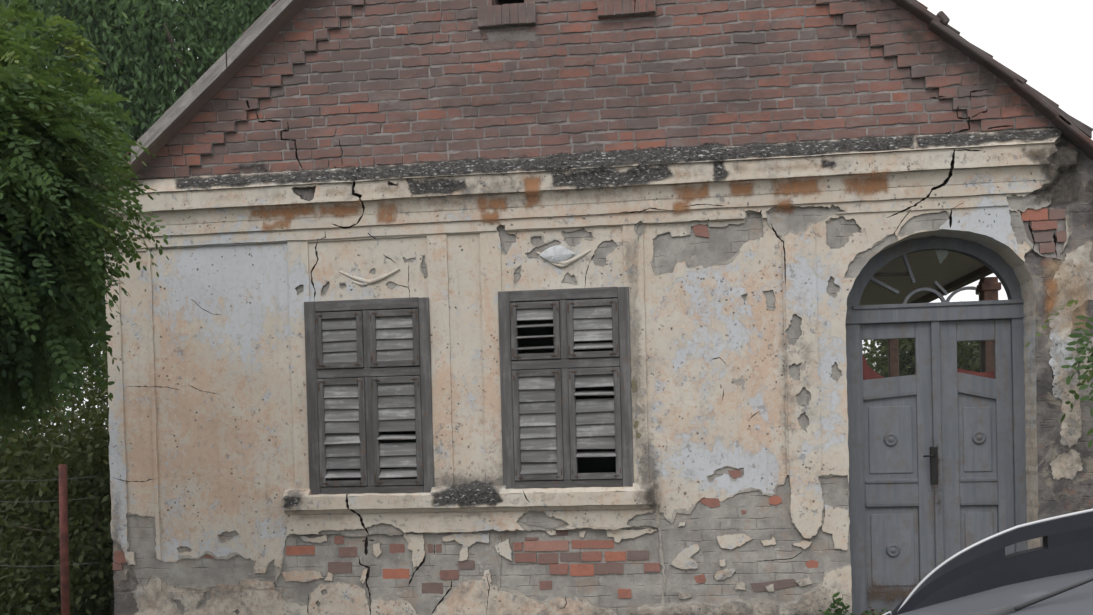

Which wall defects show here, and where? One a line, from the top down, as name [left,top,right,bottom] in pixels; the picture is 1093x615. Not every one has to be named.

crack [246,100,302,168]
crack [887,89,1015,232]
crack [311,141,410,297]
spalling [634,204,861,275]
spalling [826,210,950,298]
spalling [785,314,802,345]
spalling [788,363,811,432]
spalling [830,362,842,383]
spalling [1006,136,1093,523]
crack [346,494,374,615]
spalling [112,465,851,615]
spalling [1028,537,1043,549]